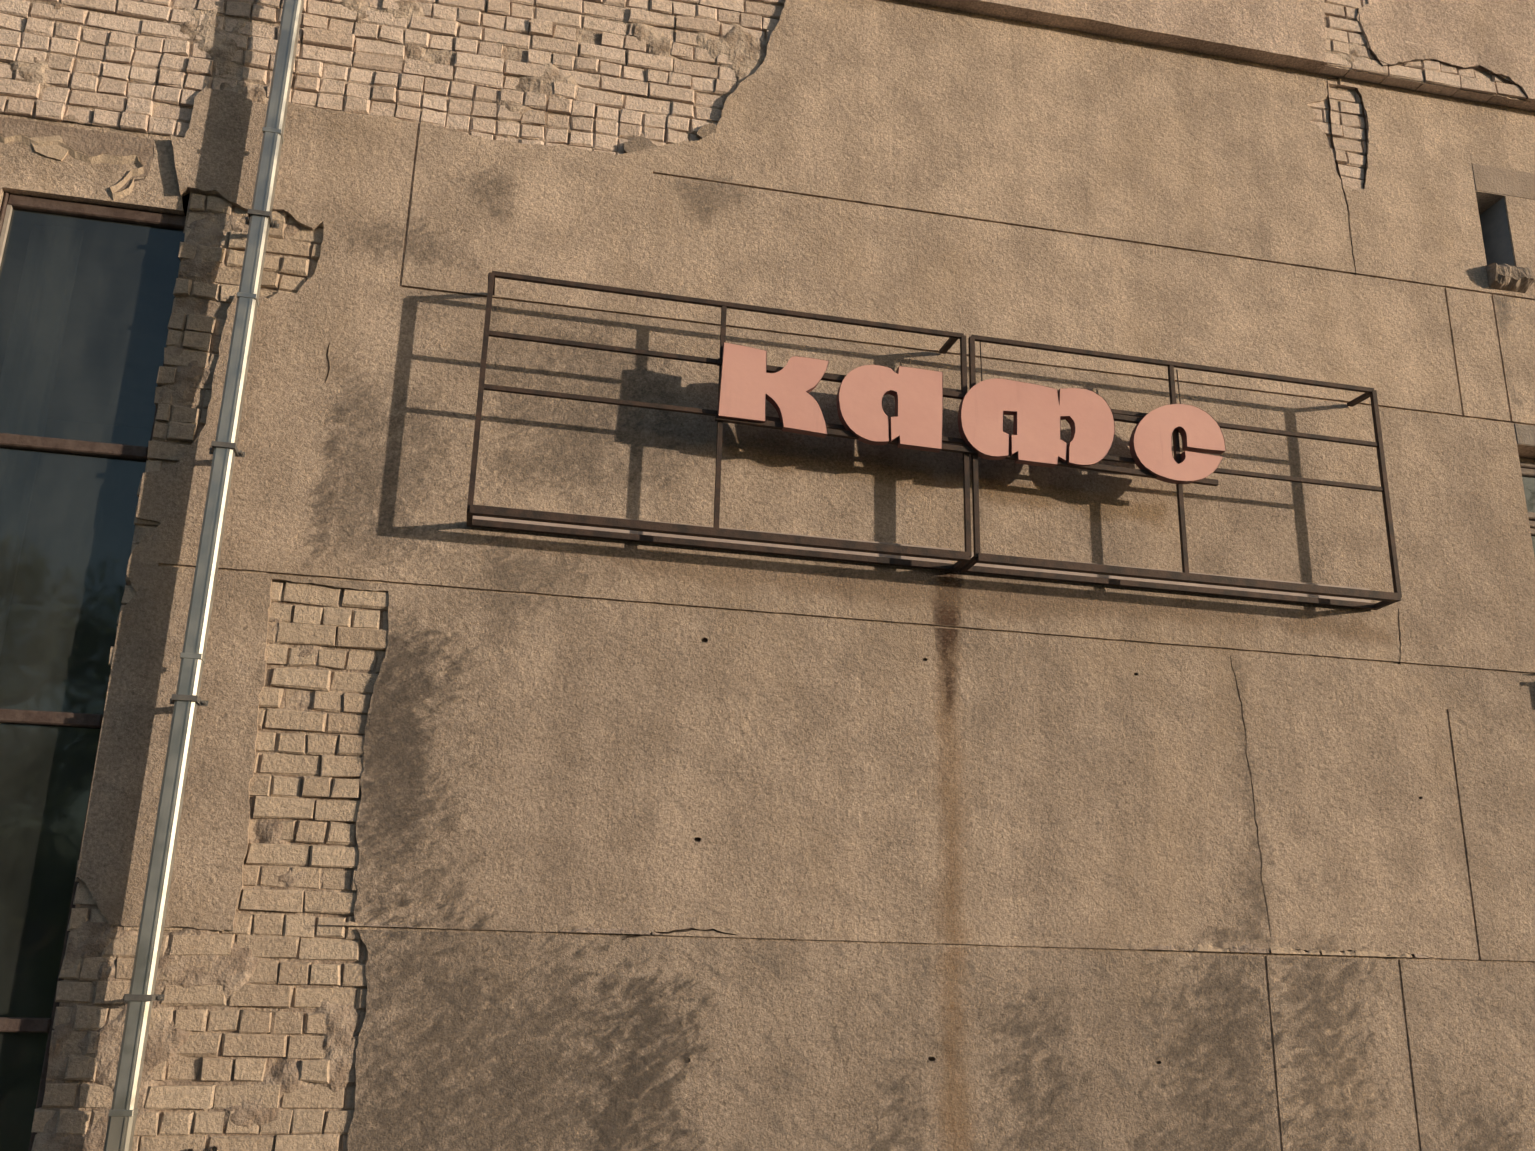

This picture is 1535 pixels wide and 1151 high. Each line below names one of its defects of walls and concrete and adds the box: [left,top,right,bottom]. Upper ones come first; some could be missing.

flaking render [0,0,284,201]
flaking render [259,211,324,299]
flaking render [289,0,786,155]
flaking render [1307,0,1530,190]
crack [1327,8,1528,276]
flaking render [109,191,249,666]
flaking render [132,570,440,1151]
damp [360,617,461,933]
flaking render [31,860,139,1151]
damp [351,924,700,1151]
damp [1141,941,1372,1151]